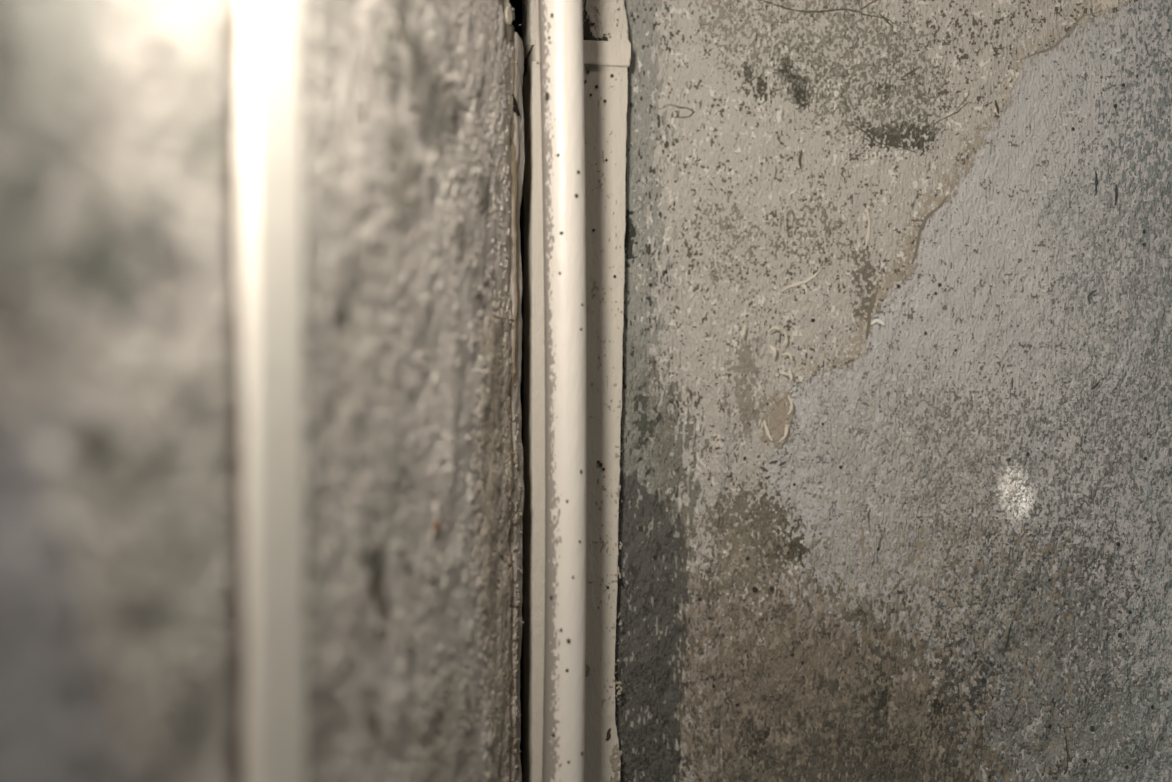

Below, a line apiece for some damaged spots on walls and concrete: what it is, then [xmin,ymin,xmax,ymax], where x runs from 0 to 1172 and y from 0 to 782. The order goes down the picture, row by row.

peeling [628,0,1141,782]
leakage [615,0,1172,782]